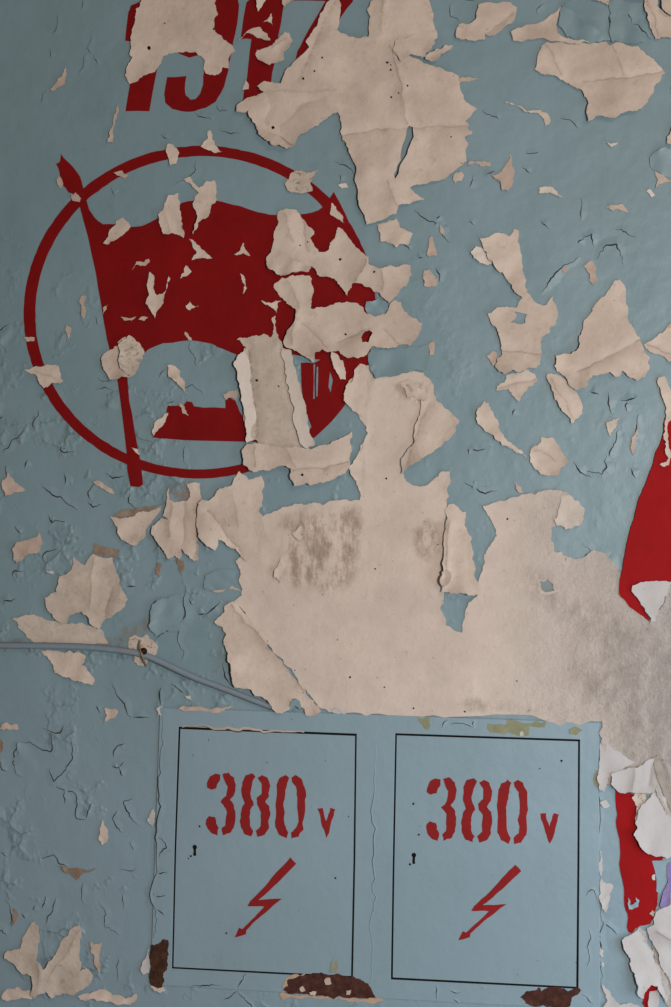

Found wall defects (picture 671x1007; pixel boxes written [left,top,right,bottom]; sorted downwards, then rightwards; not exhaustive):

peeling [125,0,671,247]
peeling [122,177,217,321]
flaking render [42,203,671,1007]
crack [0,579,304,980]
peeling [1,921,102,1001]
corrosion [149,939,169,993]
corrosion [280,960,383,1004]
corrosion [520,986,581,1007]